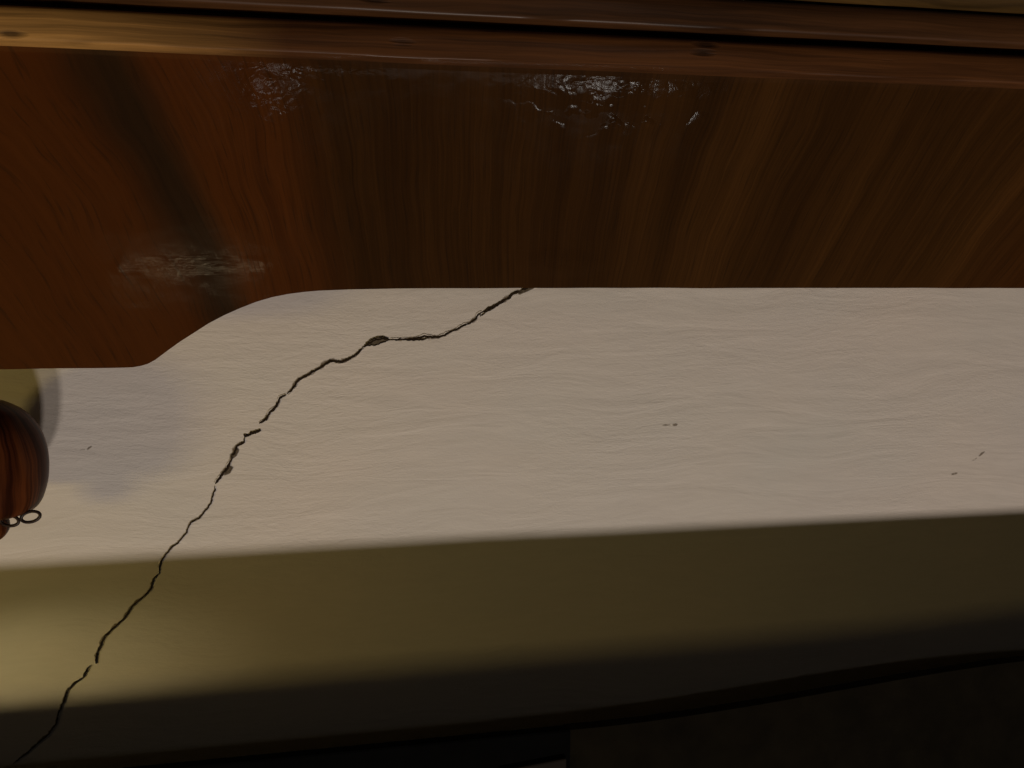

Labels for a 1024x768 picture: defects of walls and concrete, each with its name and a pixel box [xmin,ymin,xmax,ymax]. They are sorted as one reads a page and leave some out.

crack [13,288,534,764]